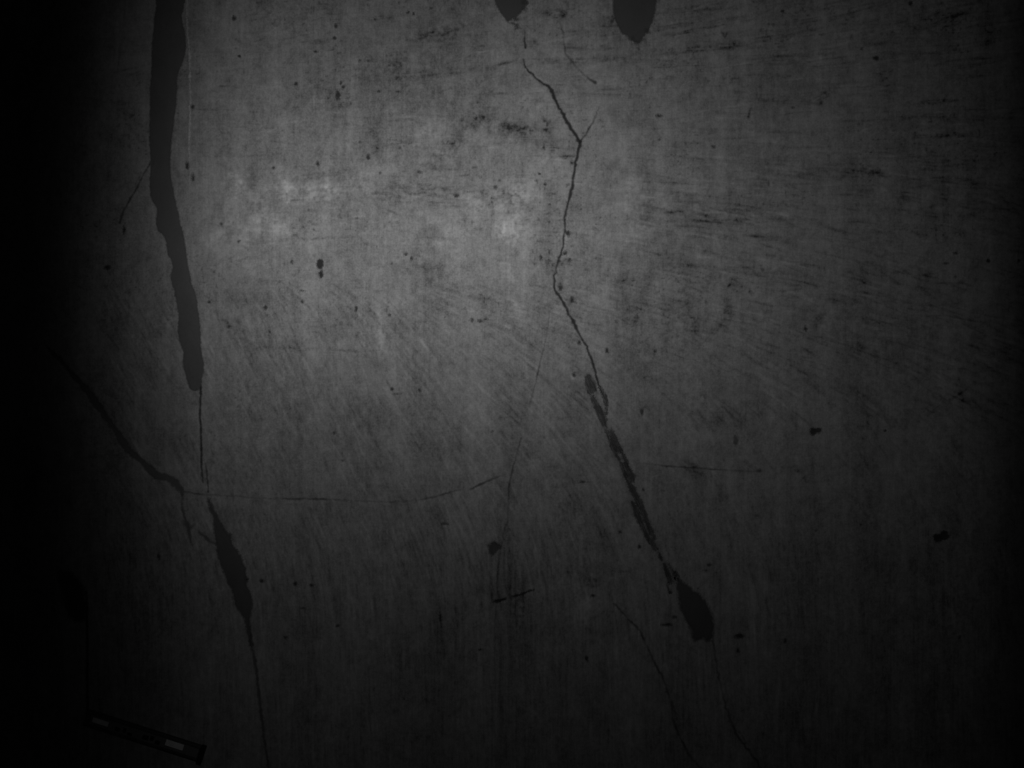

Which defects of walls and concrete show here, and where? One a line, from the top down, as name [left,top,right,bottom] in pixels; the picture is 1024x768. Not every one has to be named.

water stain [495,0,528,26]
water stain [611,0,656,43]
water stain [149,0,204,391]
crack [524,38,601,387]
crack [48,348,216,544]
water stain [208,499,253,646]
water stain [677,579,714,641]